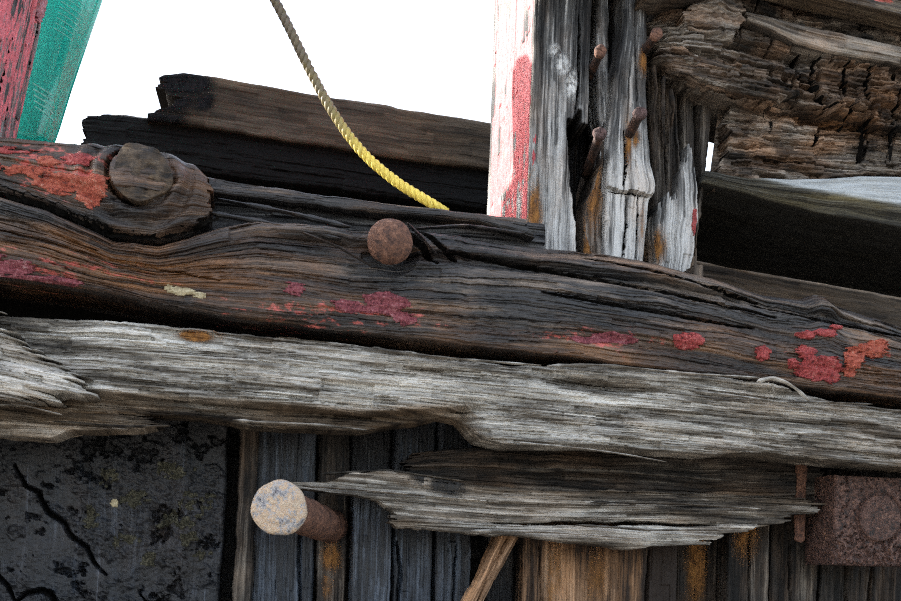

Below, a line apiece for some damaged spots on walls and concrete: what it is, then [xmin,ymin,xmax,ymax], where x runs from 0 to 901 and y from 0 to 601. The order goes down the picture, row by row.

peeling [35,0,48,24]
rust [624,131,638,161]
peeling [0,146,110,210]
peeling [330,291,417,327]
peeling [570,331,639,345]
peeling [672,332,705,350]
peeling [787,324,891,384]
crack [14,466,103,570]
crack [0,575,58,601]